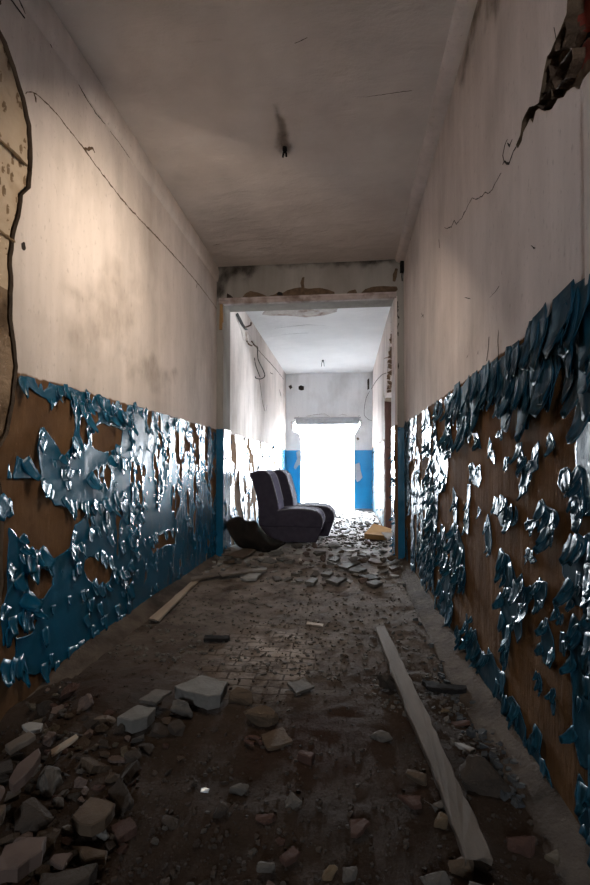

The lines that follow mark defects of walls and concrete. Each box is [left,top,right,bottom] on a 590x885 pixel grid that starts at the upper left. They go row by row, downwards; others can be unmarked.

peeling [0,30,300,688]
peeling [355,274,590,868]
crack [439,139,517,247]
spalling [516,0,590,148]